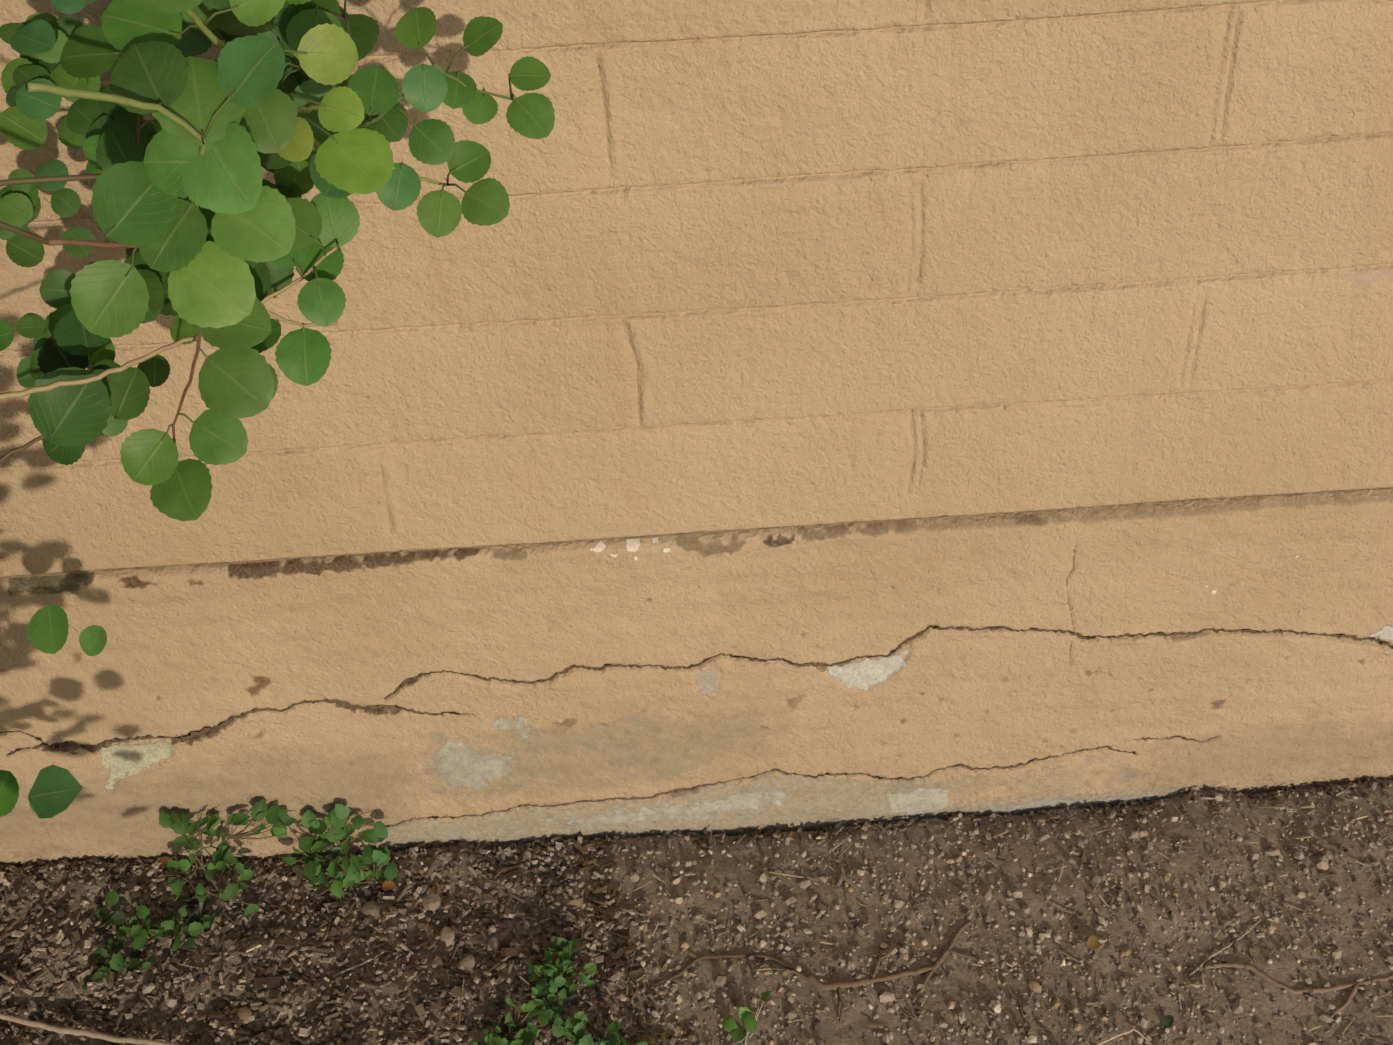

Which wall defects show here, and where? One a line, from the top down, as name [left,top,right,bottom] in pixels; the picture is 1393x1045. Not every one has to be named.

peeling [590,537,671,560]
crack [0,545,1393,756]
spalling [826,650,909,692]
spalling [101,741,173,791]
crack [385,736,1216,828]